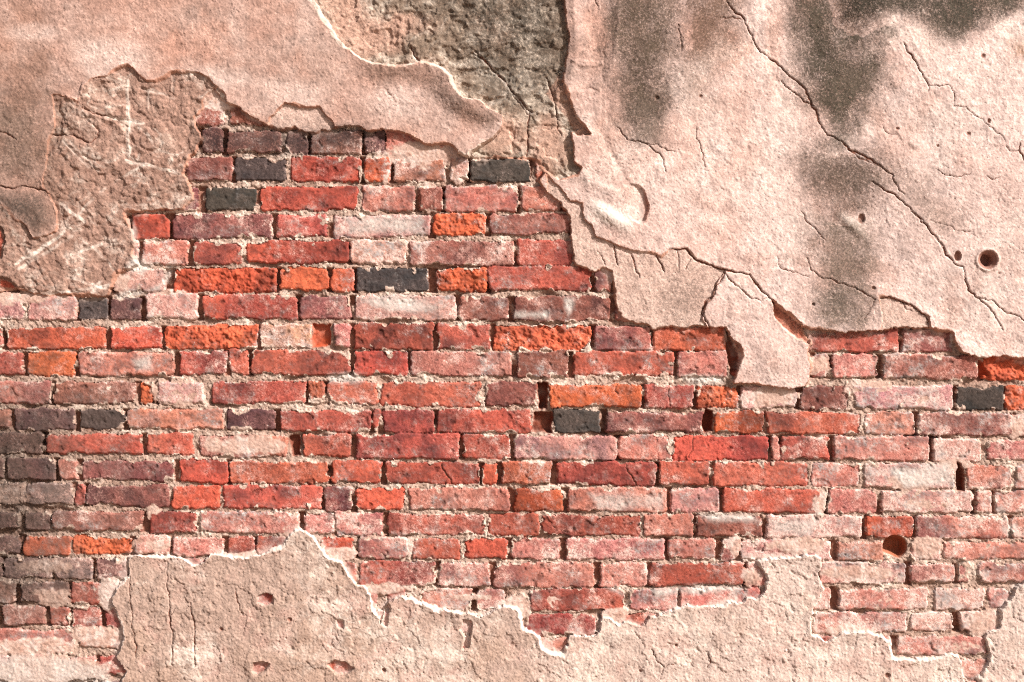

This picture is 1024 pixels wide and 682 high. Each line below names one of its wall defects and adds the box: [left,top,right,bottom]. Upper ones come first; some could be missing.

water stain [609,0,672,136]
water stain [686,0,730,49]
water stain [791,0,1022,142]
flaking render [0,0,780,409]
water stain [805,158,879,193]
crack [720,0,1024,328]
crack [597,246,775,326]
water stain [824,222,867,316]
flaking render [772,286,1024,411]
spalling [73,528,343,682]
flaking render [367,590,654,658]
flaking render [812,631,962,663]